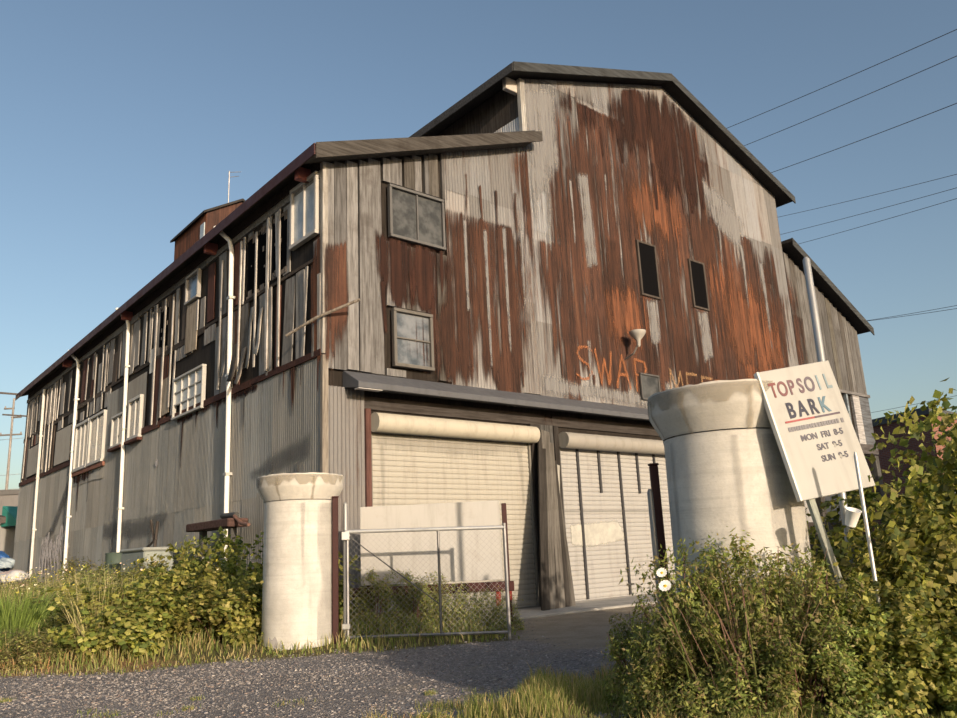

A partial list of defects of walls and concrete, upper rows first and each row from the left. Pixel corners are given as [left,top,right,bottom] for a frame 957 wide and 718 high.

rust [375,88,808,404]